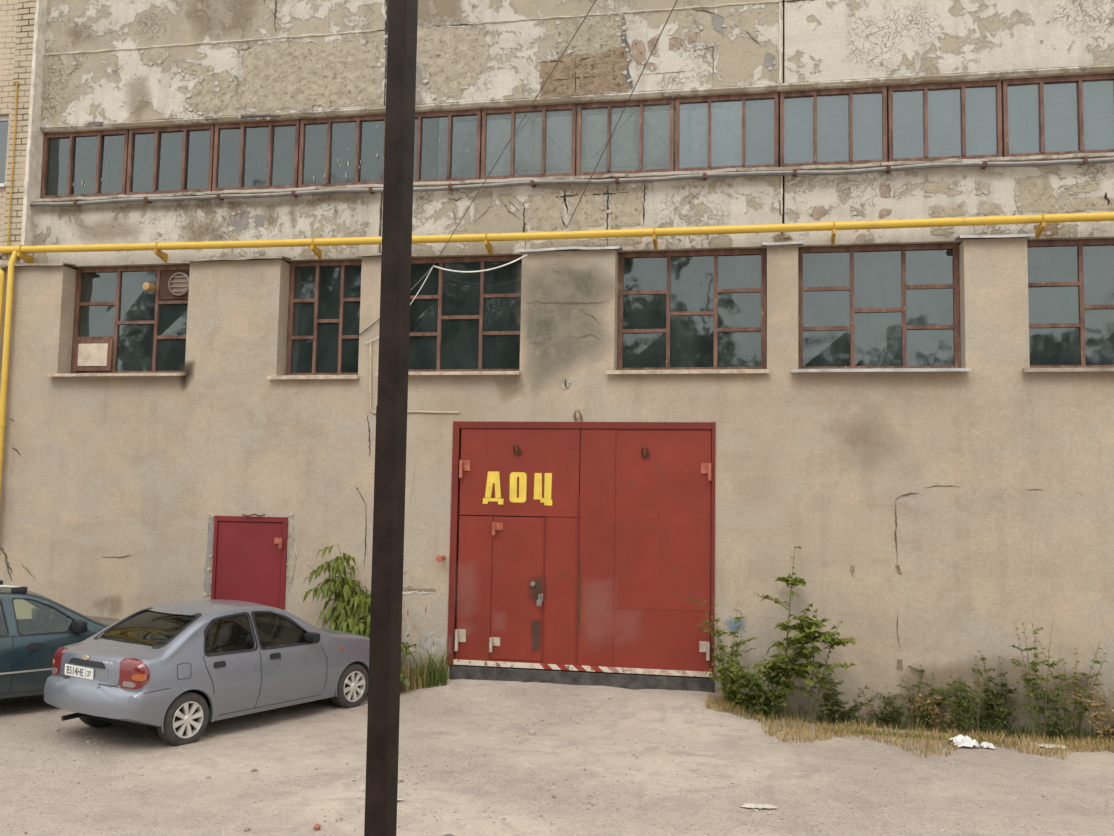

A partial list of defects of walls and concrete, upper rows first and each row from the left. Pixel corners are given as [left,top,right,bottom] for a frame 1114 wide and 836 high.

crack [383,0,391,50]
crack [692,8,761,46]
peeling [139,45,238,102]
peeling [416,25,491,106]
spalling [538,12,726,100]
peeling [229,210,267,232]
peeling [525,186,644,249]
peeling [808,206,829,220]
peeling [850,180,894,218]
peeling [924,173,1114,238]
crack [894,485,958,573]